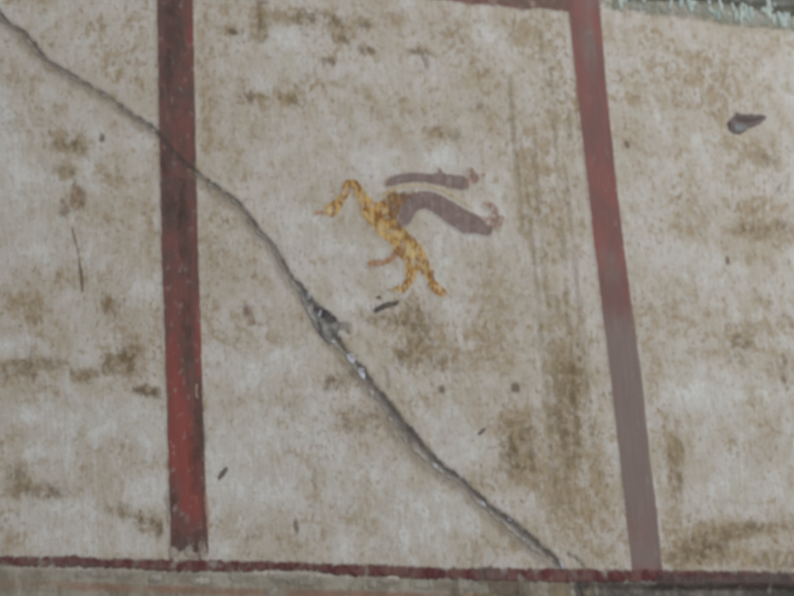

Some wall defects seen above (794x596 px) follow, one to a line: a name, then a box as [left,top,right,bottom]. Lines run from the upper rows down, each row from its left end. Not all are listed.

crack [0,12,587,570]
damp [608,0,794,30]